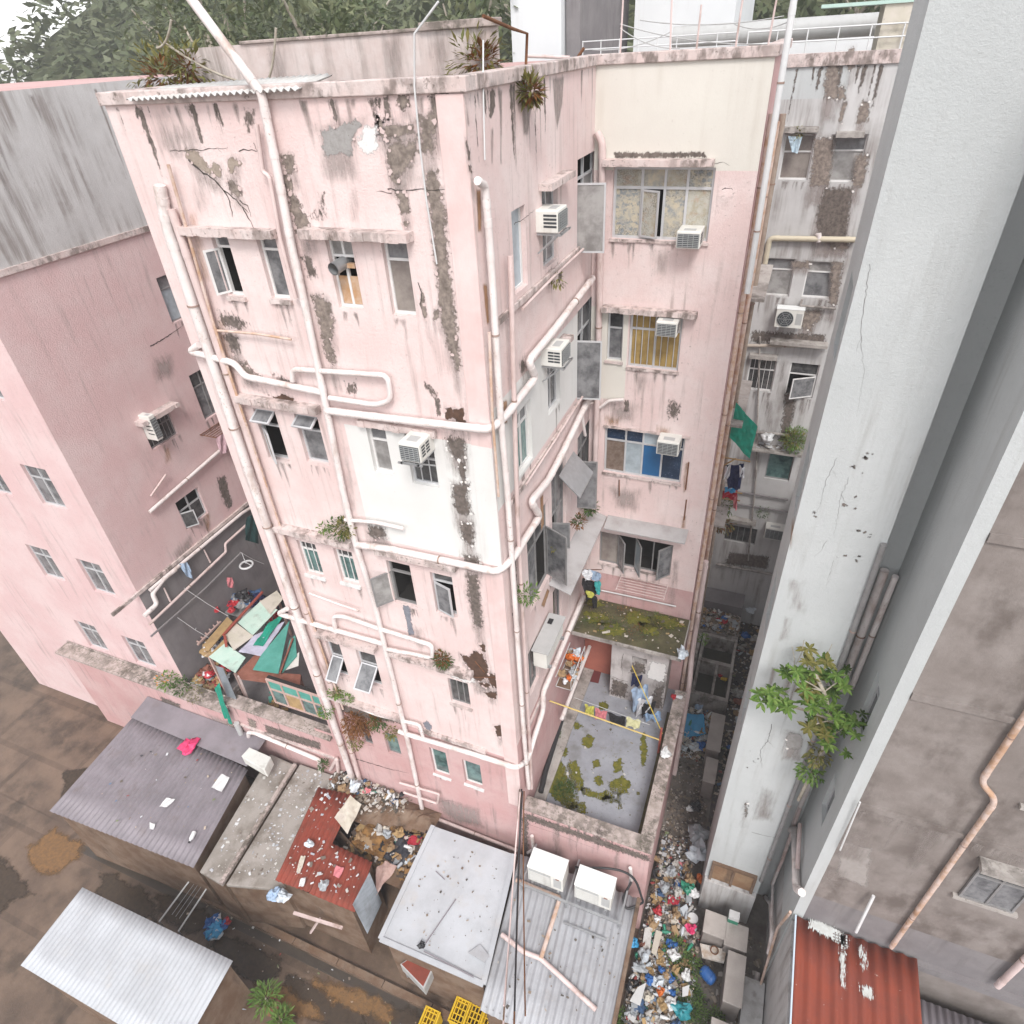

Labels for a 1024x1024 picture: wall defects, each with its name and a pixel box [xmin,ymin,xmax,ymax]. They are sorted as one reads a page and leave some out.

damp [837,65,884,106]
peeling [321,118,362,174]
crack [171,144,257,228]
damp [220,306,247,330]
damp [667,402,680,420]
damp [217,475,232,508]